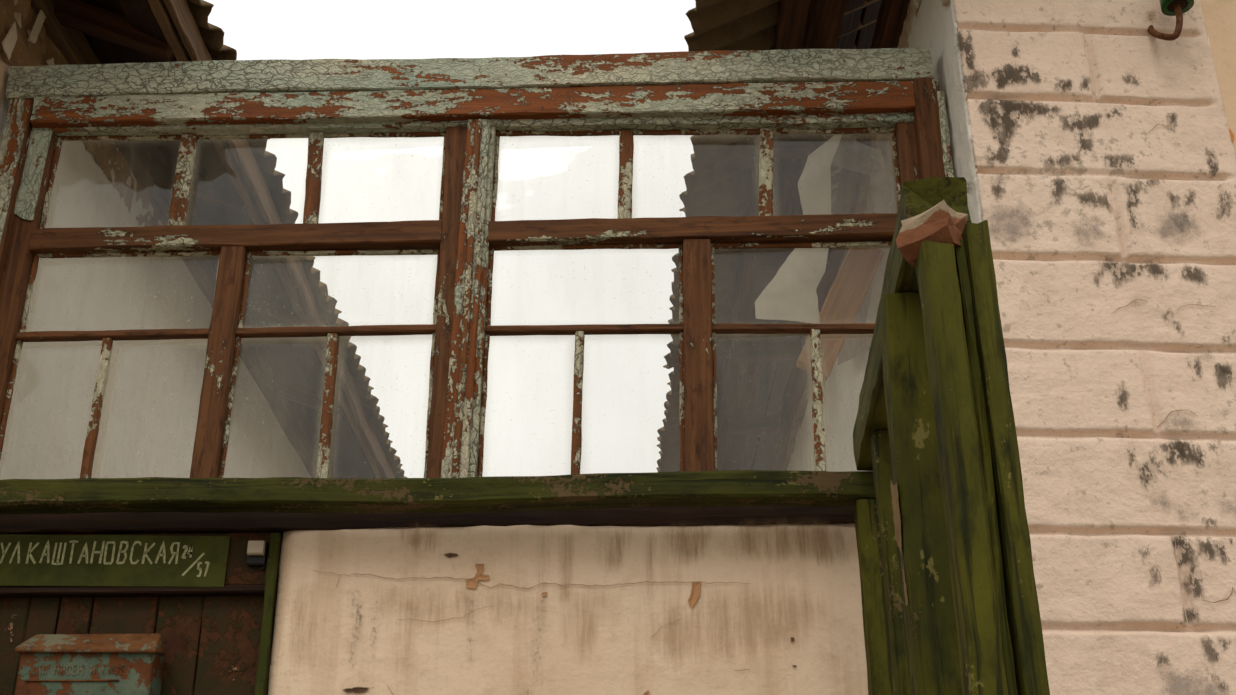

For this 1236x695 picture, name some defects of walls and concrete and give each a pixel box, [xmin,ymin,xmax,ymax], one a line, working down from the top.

flaking render [0,0,69,66]
flaking render [897,0,921,48]
flaking render [81,140,159,227]
crack [315,570,751,622]